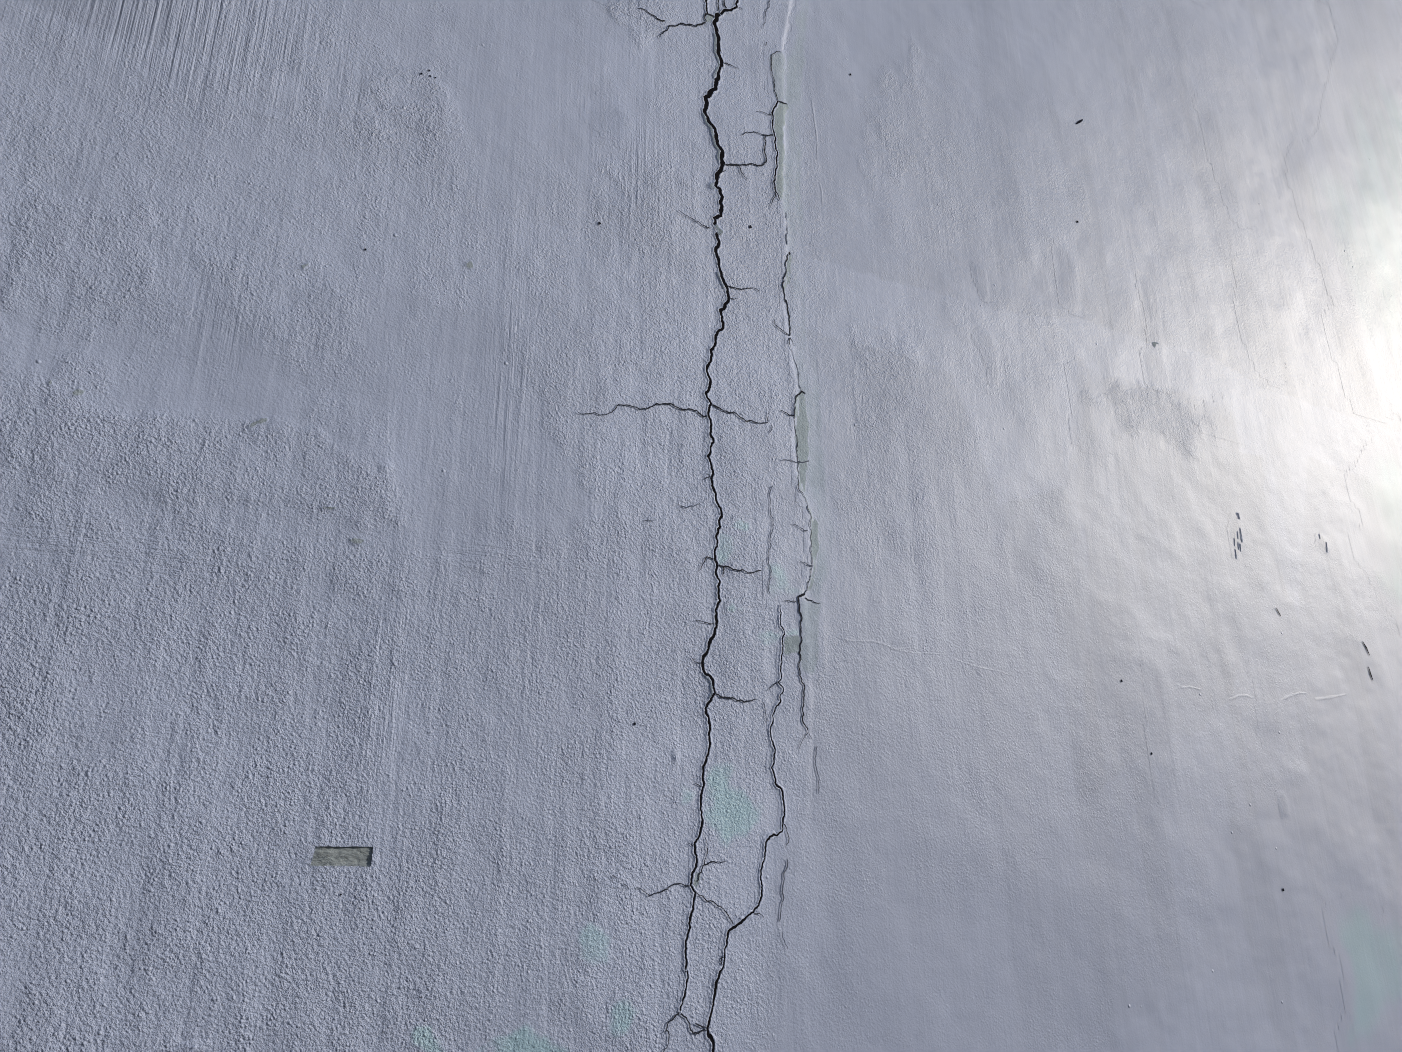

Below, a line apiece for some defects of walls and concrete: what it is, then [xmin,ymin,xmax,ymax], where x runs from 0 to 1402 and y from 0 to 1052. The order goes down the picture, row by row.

flaking render [300,838,381,875]
crack [578,0,824,1052]